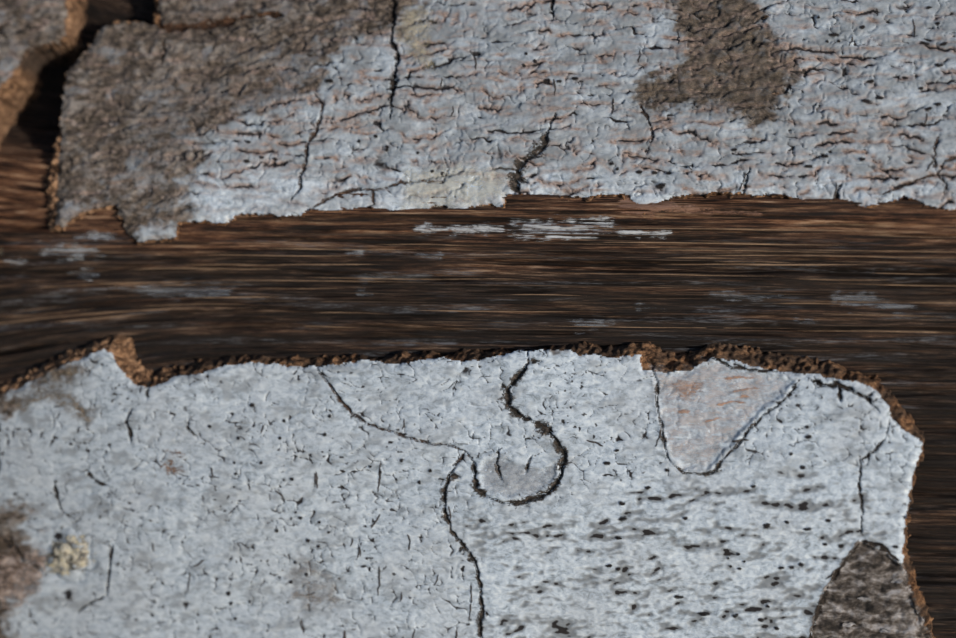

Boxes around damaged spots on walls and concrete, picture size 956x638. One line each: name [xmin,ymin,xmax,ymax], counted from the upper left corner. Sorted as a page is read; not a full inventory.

crack [389,0,401,117]
crack [507,112,556,194]
crack [712,358,778,373]
crack [653,371,872,477]
crack [317,352,570,638]
crack [809,423,900,638]
peeling [809,540,933,638]